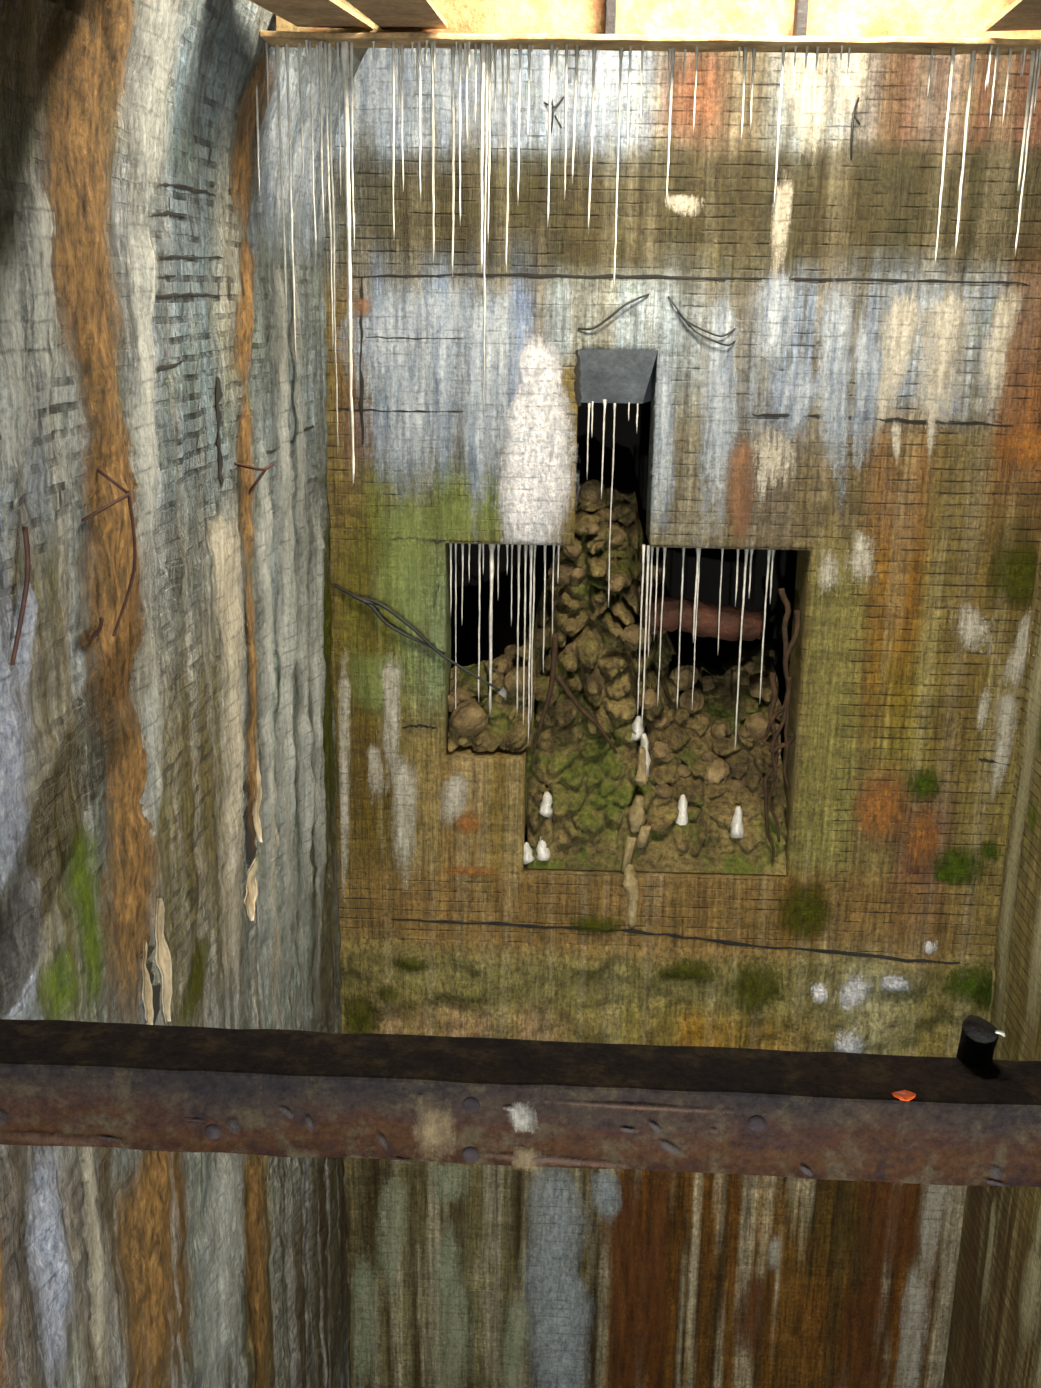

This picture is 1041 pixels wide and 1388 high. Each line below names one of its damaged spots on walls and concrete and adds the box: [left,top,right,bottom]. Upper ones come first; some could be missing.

water stain [263,48,415,227]
water stain [434,48,627,142]
water stain [759,181,795,359]
corrosion [45,0,159,1008]
water stain [340,286,572,621]
water stain [753,293,967,501]
corrosion [852,781,941,864]
peeling [141,898,172,1025]
crack [391,919,960,965]
corrosion [590,1104,705,1112]
corrosion [124,1151,173,1388]
corrosion [603,1181,668,1388]